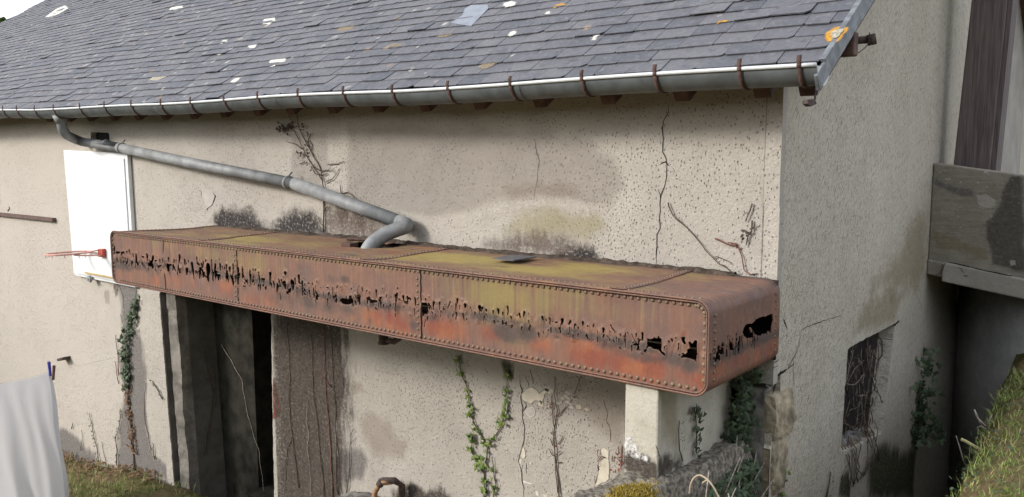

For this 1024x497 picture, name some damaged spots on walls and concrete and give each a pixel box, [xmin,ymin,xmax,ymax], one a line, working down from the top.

crack [656,109,669,255]
damp [214,207,377,236]
damp [502,235,597,259]
crack [772,316,839,395]
damp [273,315,365,497]
peeling [521,387,590,417]
peeling [595,447,610,487]